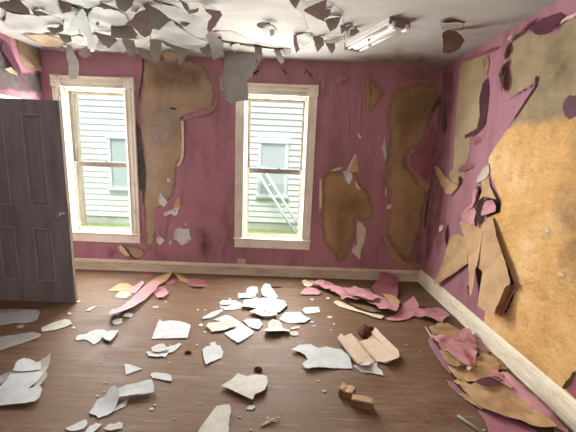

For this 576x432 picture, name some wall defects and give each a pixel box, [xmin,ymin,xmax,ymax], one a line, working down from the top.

peeling [0,0,359,103]
peeling [440,18,465,54]
flaking render [159,193,179,216]
flaking render [156,222,192,246]